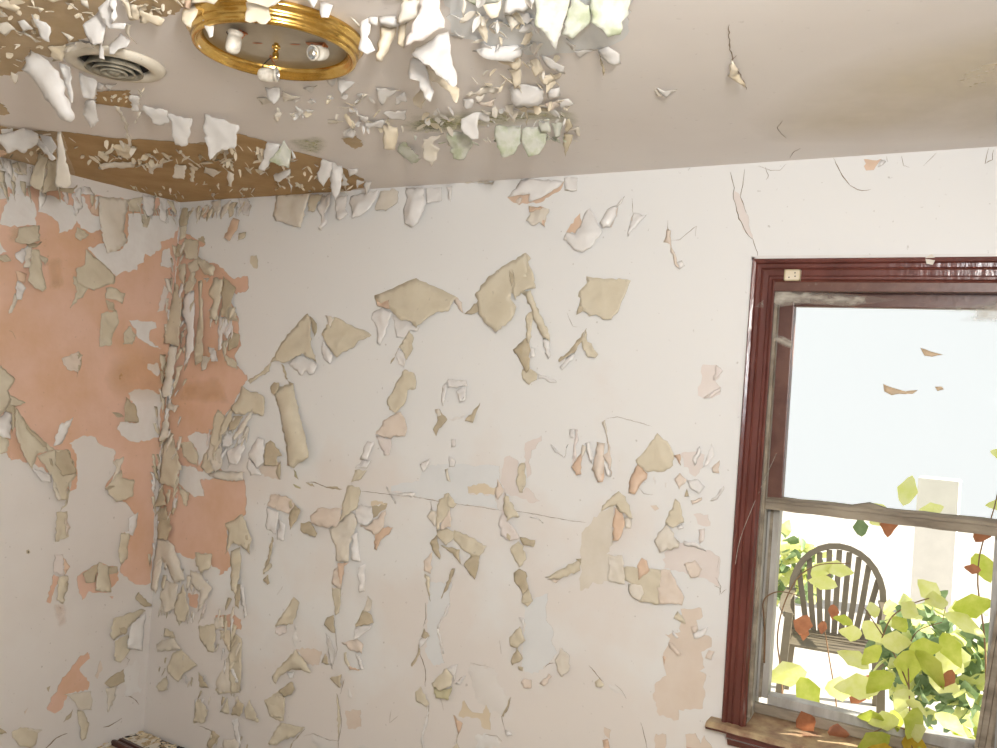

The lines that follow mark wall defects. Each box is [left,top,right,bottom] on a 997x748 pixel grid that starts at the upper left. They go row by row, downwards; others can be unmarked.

crack [730,123,799,256]
flaking render [0,0,633,748]
crack [293,482,585,523]
peeling [495,417,724,663]